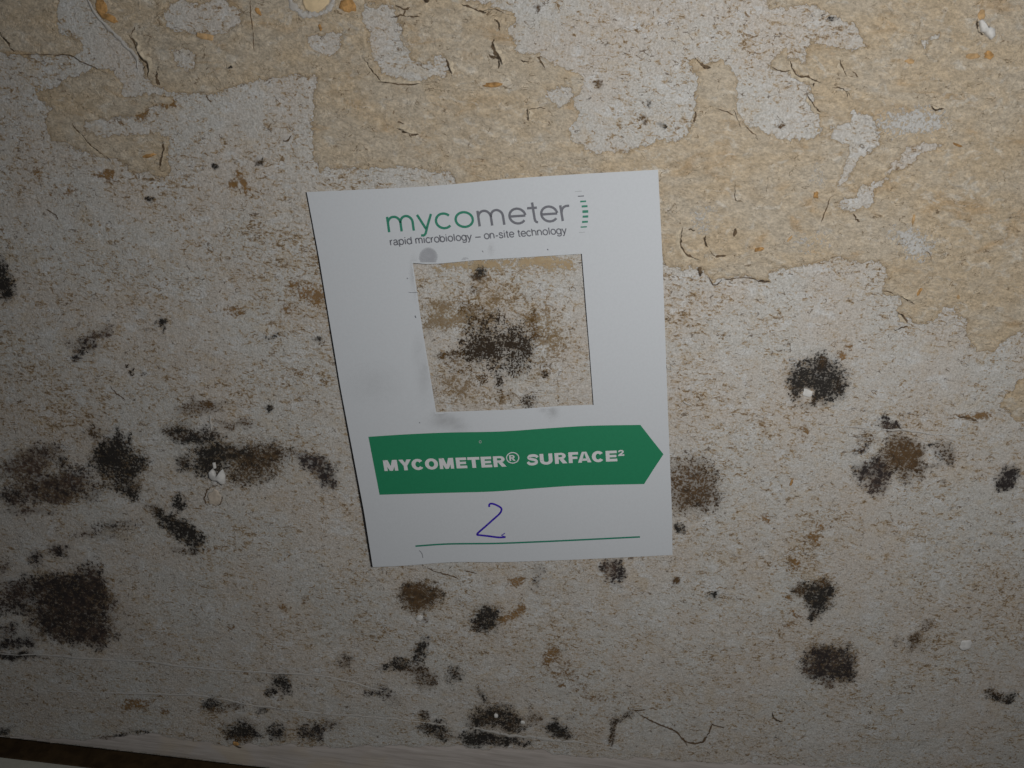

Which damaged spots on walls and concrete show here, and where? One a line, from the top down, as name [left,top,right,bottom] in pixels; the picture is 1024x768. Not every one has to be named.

peeling [0,0,83,59]
peeling [35,0,1024,352]
leakage [422,264,571,408]
leakage [783,350,849,407]
leakage [0,424,207,556]
leakage [162,395,338,489]
leakage [670,450,725,534]
leakage [851,415,956,498]
leakage [0,521,136,662]
leakage [383,578,466,691]
leakage [791,579,839,622]
leakage [415,688,573,748]